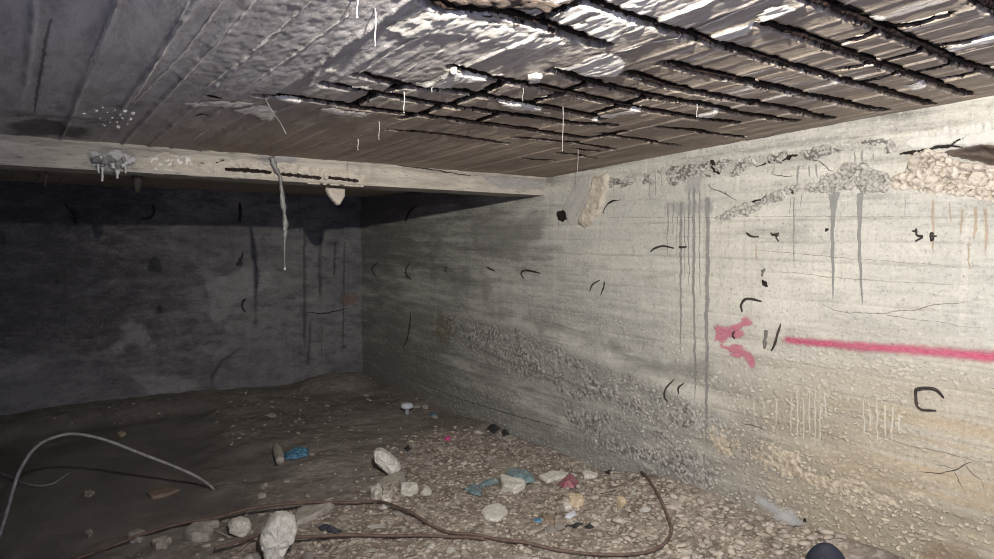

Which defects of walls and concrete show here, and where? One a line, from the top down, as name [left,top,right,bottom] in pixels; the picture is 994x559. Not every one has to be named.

spalling [430,0,994,102]
spalling [266,59,882,161]
leakage [90,149,136,182]
spalling [557,138,994,228]
leakage [829,192,840,295]
leakage [667,175,712,433]
crack [860,429,984,492]